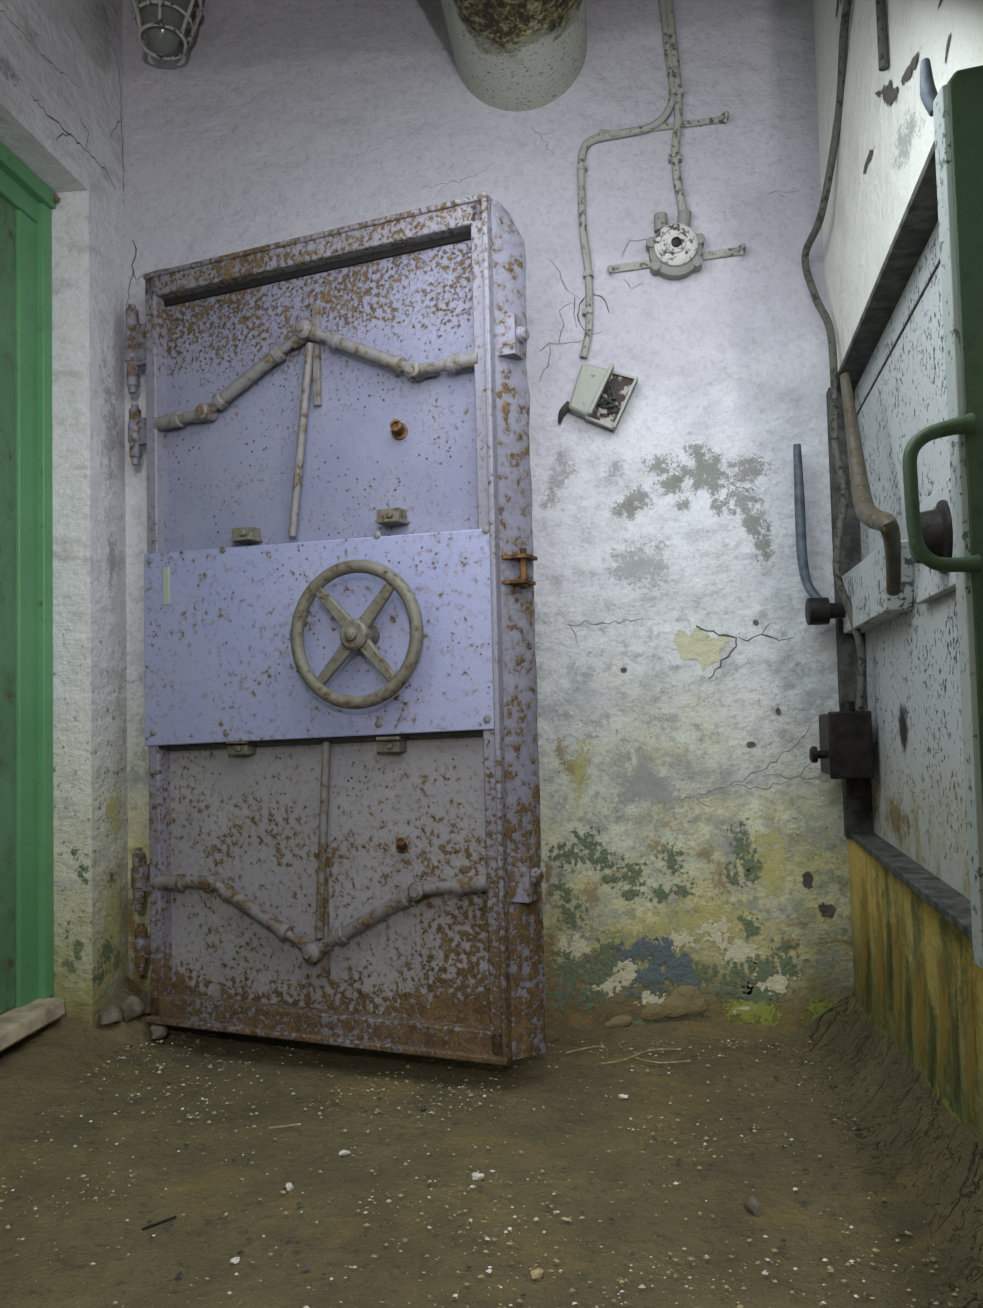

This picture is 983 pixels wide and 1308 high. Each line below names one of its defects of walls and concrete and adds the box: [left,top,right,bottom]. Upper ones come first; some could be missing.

crack [738,622,794,642]
peeling [542,818,809,1030]
water stain [865,920,912,1058]